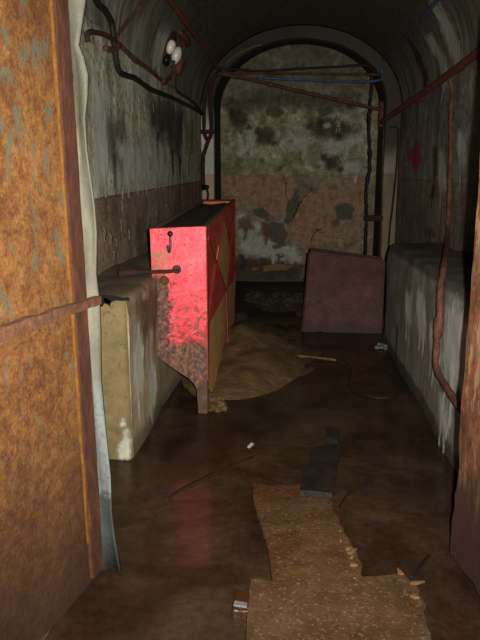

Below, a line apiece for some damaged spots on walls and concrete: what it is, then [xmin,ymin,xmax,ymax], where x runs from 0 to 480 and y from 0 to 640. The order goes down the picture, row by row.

damp [151,102,182,190]
damp [230,110,276,157]
damp [289,112,364,183]
peeling [221,173,365,250]
damp [236,213,303,282]